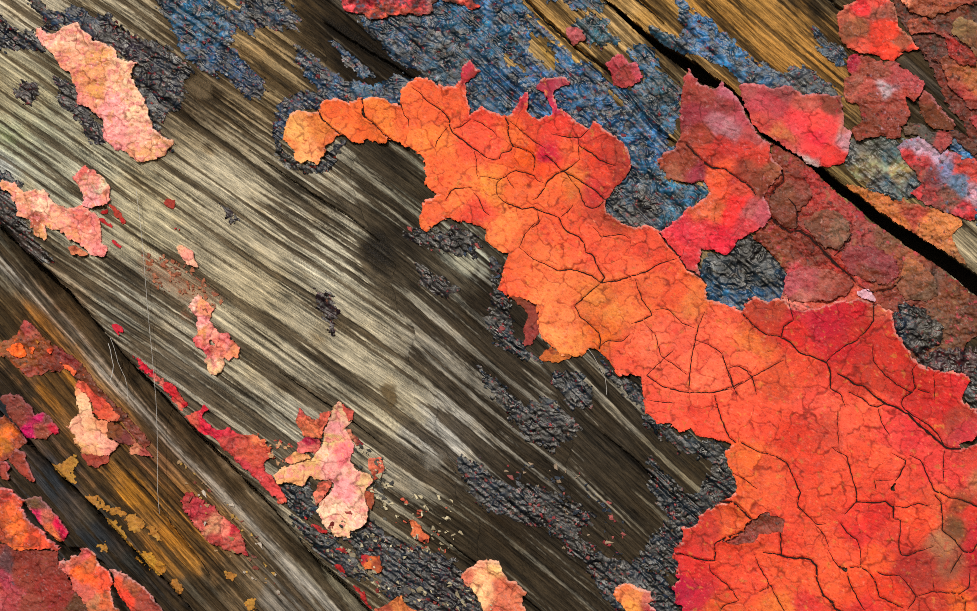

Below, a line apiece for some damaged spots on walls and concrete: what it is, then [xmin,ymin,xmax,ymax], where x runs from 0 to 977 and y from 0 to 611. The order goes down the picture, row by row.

peeling [35,22,174,162]
crack [525,0,621,88]
peeling [605,54,643,88]
peeling [0,165,126,257]
peeling [6,339,53,358]
peeling [188,295,240,375]
peeling [283,60,977,611]
crack [327,25,977,611]
peeling [0,362,163,611]
peeling [133,356,385,556]